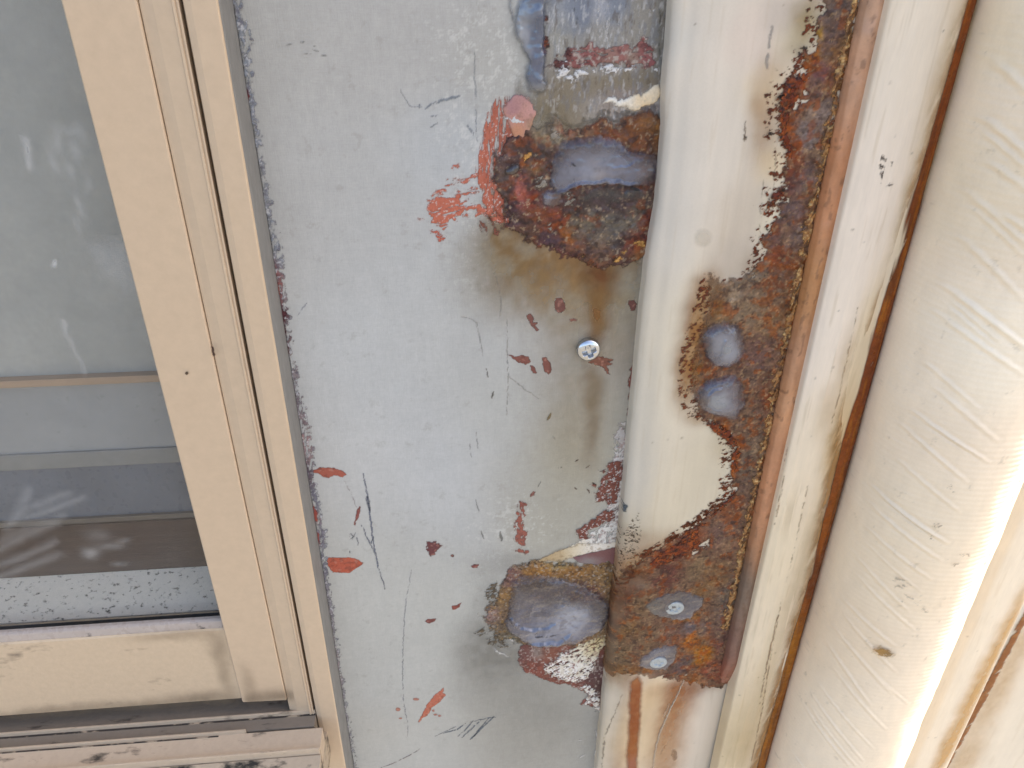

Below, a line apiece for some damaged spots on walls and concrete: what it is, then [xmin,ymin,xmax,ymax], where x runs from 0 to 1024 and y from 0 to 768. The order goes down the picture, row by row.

peeling [550,36,658,83]
peeling [555,298,576,321]
peeling [233,0,363,767]
peeling [509,355,552,374]
peeling [588,356,613,375]
rust [475,0,858,768]
peeling [539,365,633,565]
peeling [413,688,446,722]